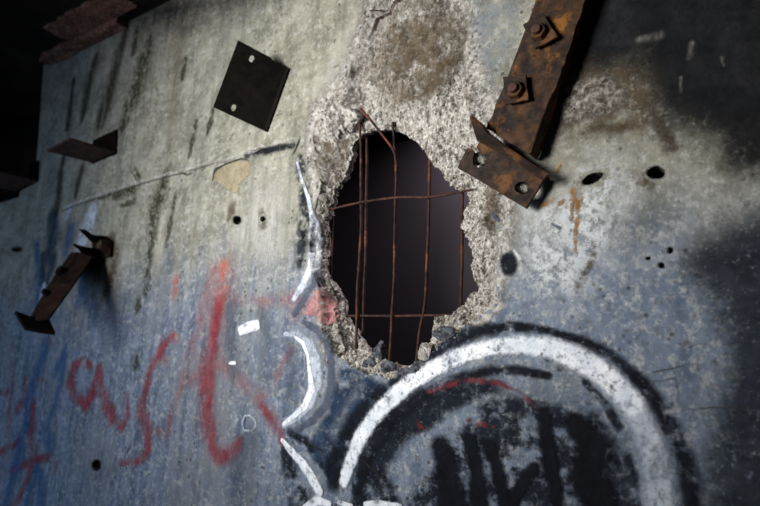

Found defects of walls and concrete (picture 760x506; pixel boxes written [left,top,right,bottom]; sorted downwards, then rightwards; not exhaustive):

water stain [80,54,98,121]
water stain [96,0,244,133]
water stain [54,156,65,219]
flaking render [212,151,255,193]
spalling [305,0,522,380]
corrosion [539,189,583,251]